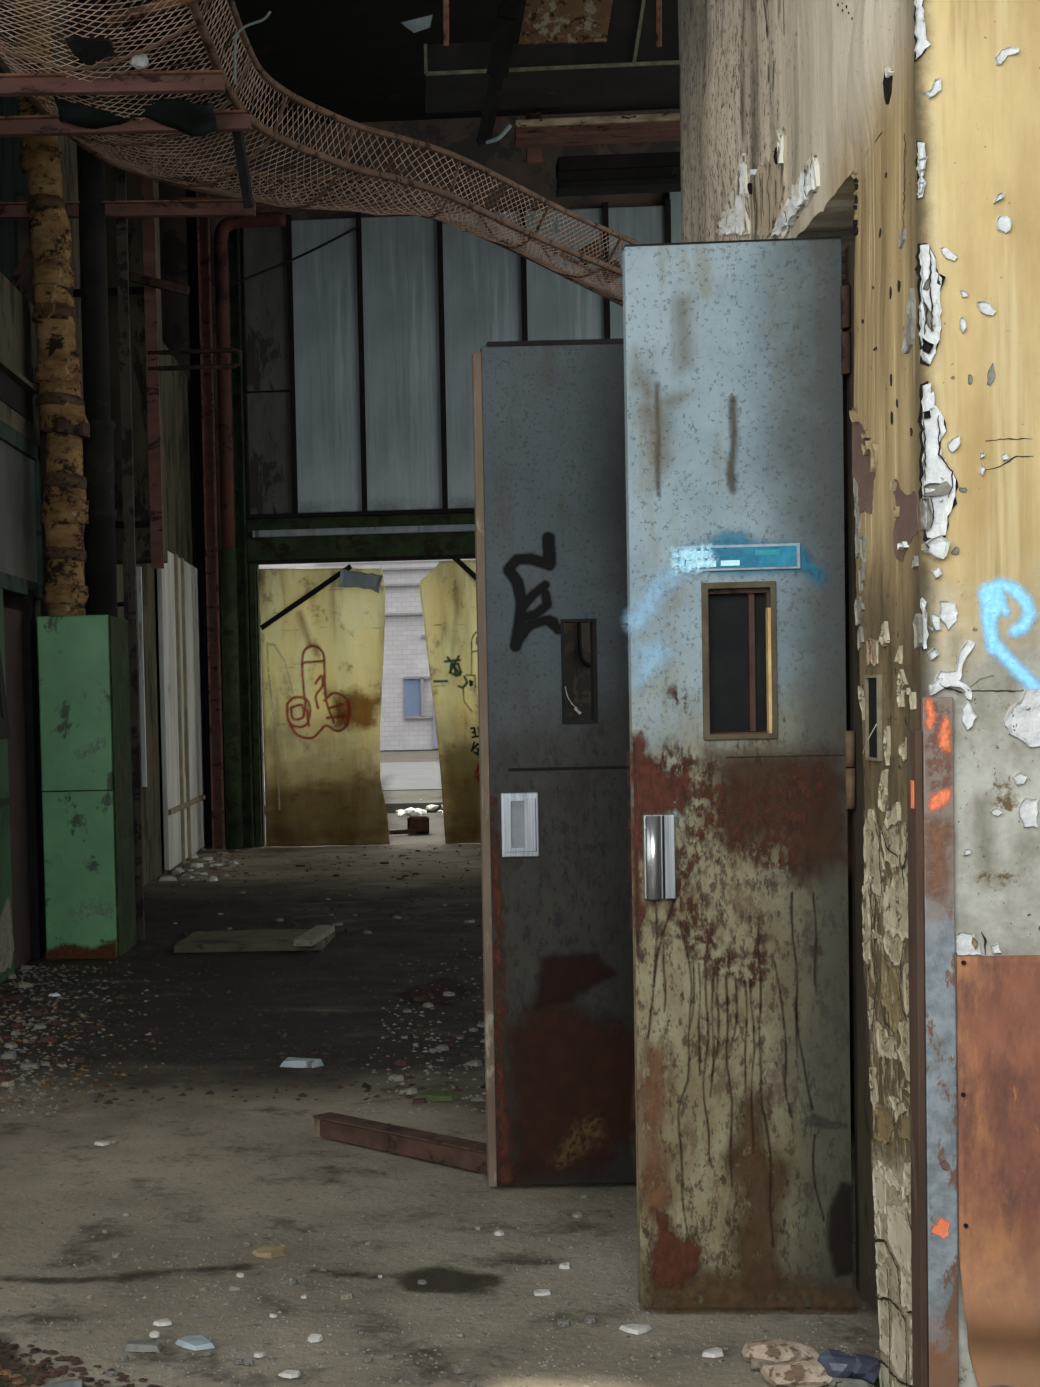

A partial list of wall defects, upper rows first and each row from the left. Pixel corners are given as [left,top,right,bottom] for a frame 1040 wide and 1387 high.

flaking render [913,0,931,62]
peeling [994,46,1019,66]
flaking render [715,127,820,239]
flaking render [915,141,928,200]
peeling [993,192,1011,234]
peeling [959,290,996,333]
flaking render [849,243,977,730]
peeling [1003,688,1040,747]
peeling [990,772,1038,827]
peeling [955,931,1002,955]
corrosion [490,731,855,1315]
corrosion [956,955,1040,1387]